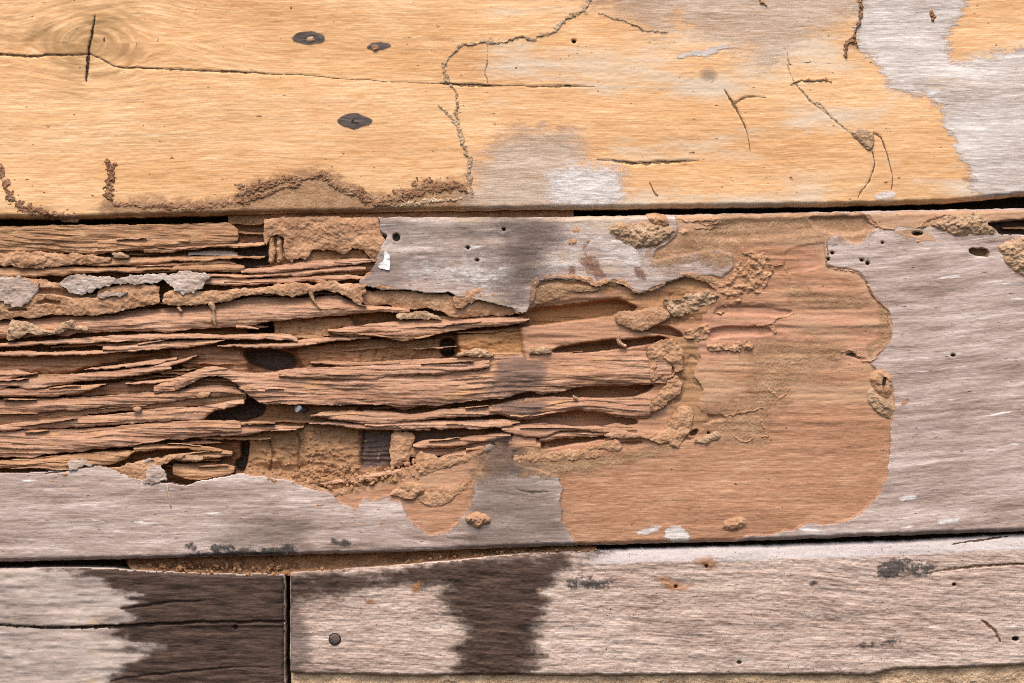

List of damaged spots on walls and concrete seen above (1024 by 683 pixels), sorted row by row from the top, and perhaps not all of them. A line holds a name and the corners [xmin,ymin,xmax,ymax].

crack [0,15,595,88]
peeling [332,210,1024,544]
leakage [47,550,614,683]